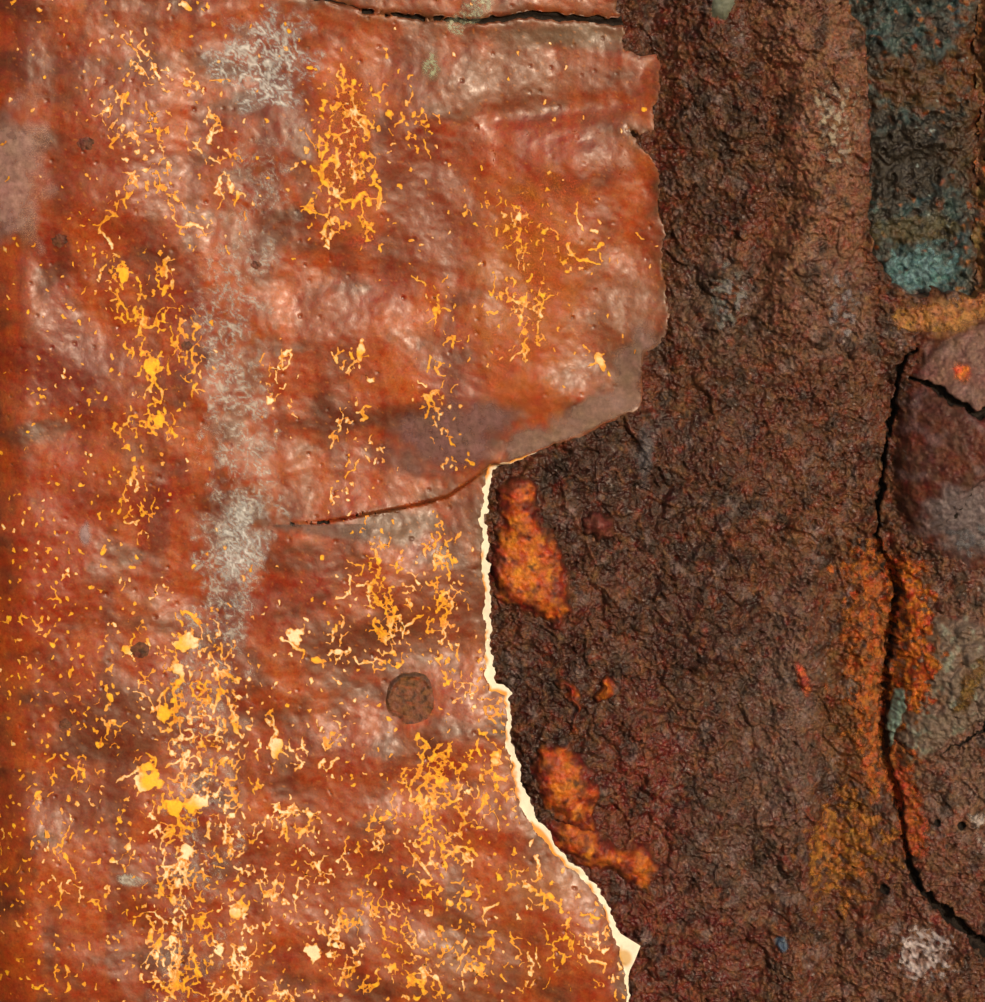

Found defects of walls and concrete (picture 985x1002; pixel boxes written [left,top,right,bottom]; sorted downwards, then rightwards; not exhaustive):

crack [314,0,623,26]
peeling [290,47,450,252]
peeling [51,0,262,591]
peeling [462,189,618,367]
peeling [0,497,626,1002]
peeling [327,397,385,521]
peeling [412,354,475,471]
corrosion [486,475,572,634]
corrosion [529,674,660,896]
corrosion [797,665,811,695]
corrosion [803,538,949,917]
crack [873,348,985,958]